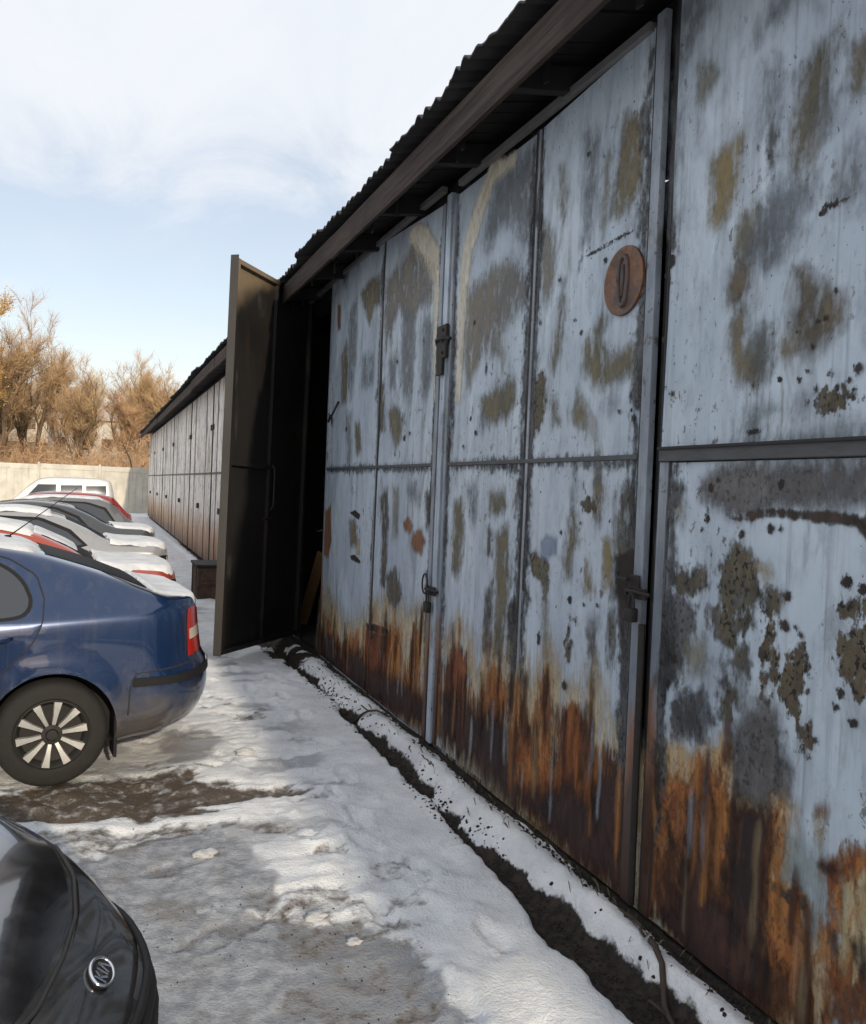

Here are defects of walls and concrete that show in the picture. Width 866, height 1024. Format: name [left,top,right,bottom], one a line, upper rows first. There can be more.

spalling [827,362,863,390]
rust [317,550,635,894]
peeling [672,530,785,722]
rust [633,572,866,1024]